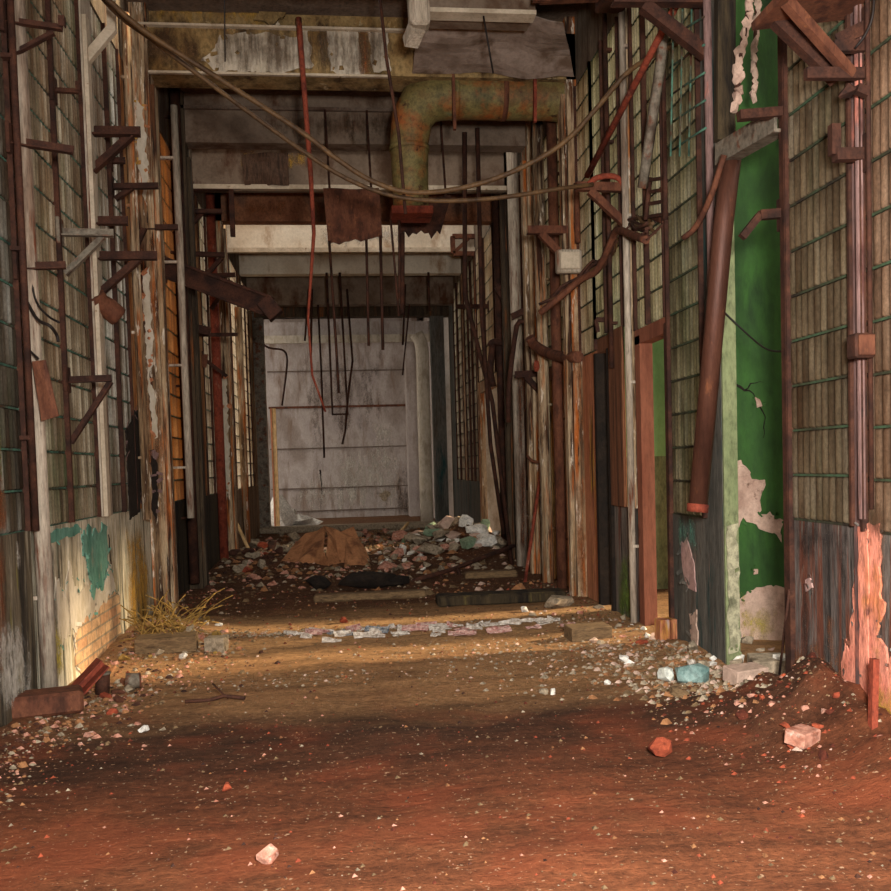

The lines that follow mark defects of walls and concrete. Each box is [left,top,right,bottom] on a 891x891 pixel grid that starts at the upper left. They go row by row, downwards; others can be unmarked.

water stain [226,29,289,69]
water stain [310,32,382,72]
efflorescence [2,631,30,703]
peeling [51,522,122,674]
peeling [723,460,785,685]
peeling [841,522,891,711]